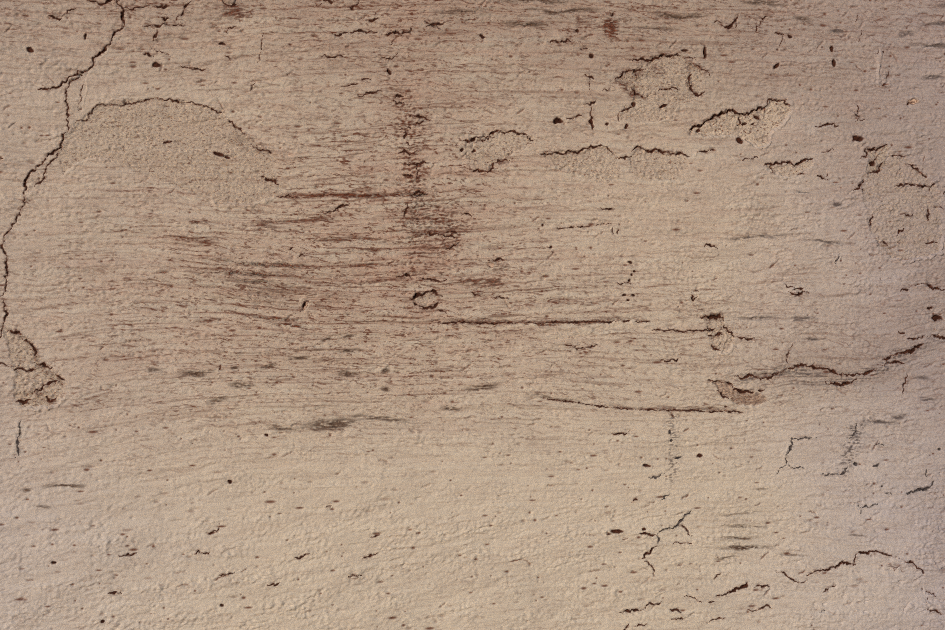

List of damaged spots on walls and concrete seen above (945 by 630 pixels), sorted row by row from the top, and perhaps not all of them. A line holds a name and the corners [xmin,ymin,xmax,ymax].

crack [0,0,191,338]
spalling [460,130,533,173]
spalling [541,98,828,183]
crack [737,331,945,386]
crack [721,550,943,615]